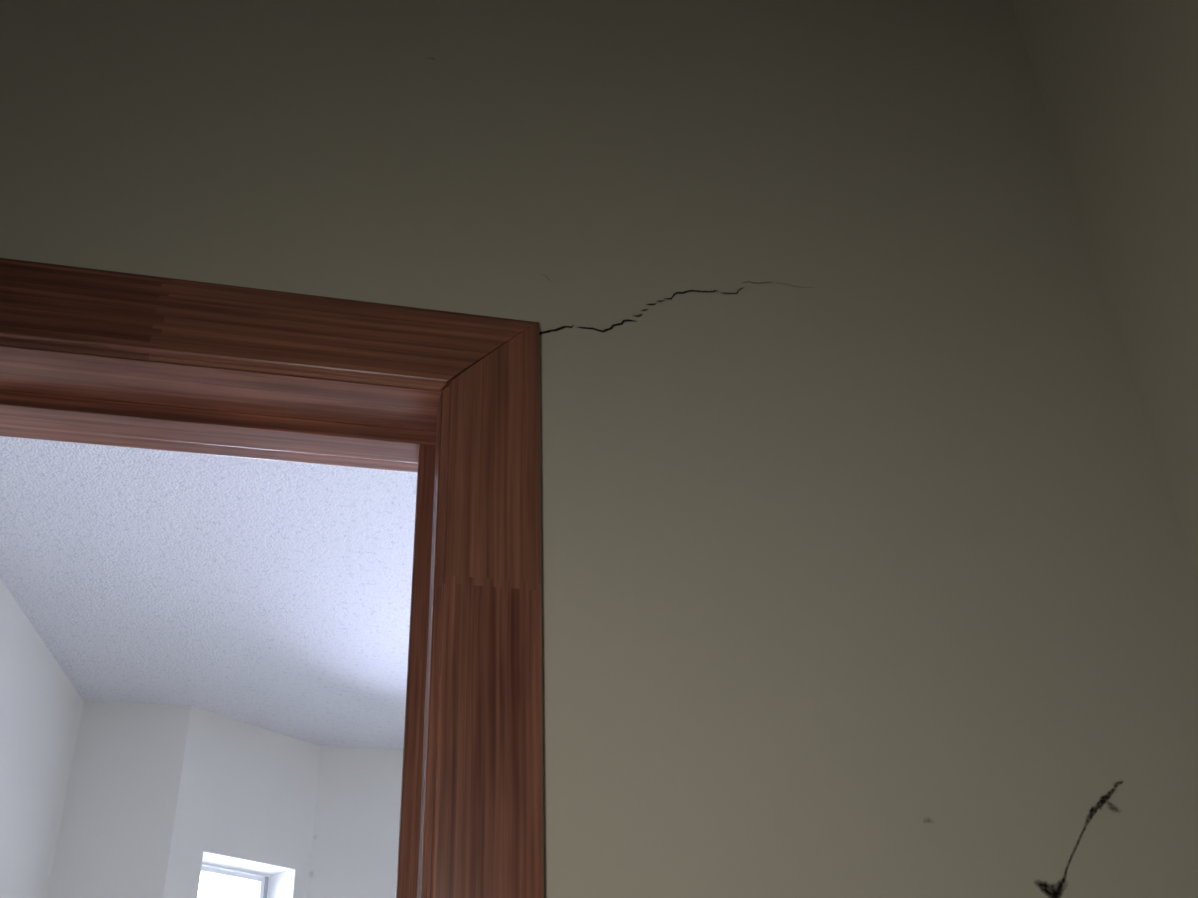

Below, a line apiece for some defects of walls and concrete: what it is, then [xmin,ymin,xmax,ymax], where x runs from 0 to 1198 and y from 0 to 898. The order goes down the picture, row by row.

crack [539,281,770,335]
crack [1038,785,1117,898]